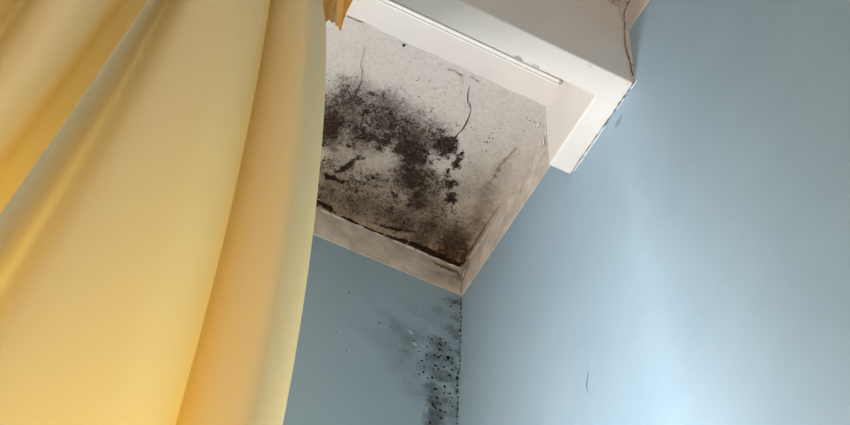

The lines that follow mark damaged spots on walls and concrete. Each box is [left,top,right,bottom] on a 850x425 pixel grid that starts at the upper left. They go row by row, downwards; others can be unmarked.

crack [353,48,365,100]
crack [433,68,478,156]
crack [577,0,634,164]
leakage [316,71,478,276]
leakage [418,337,459,425]